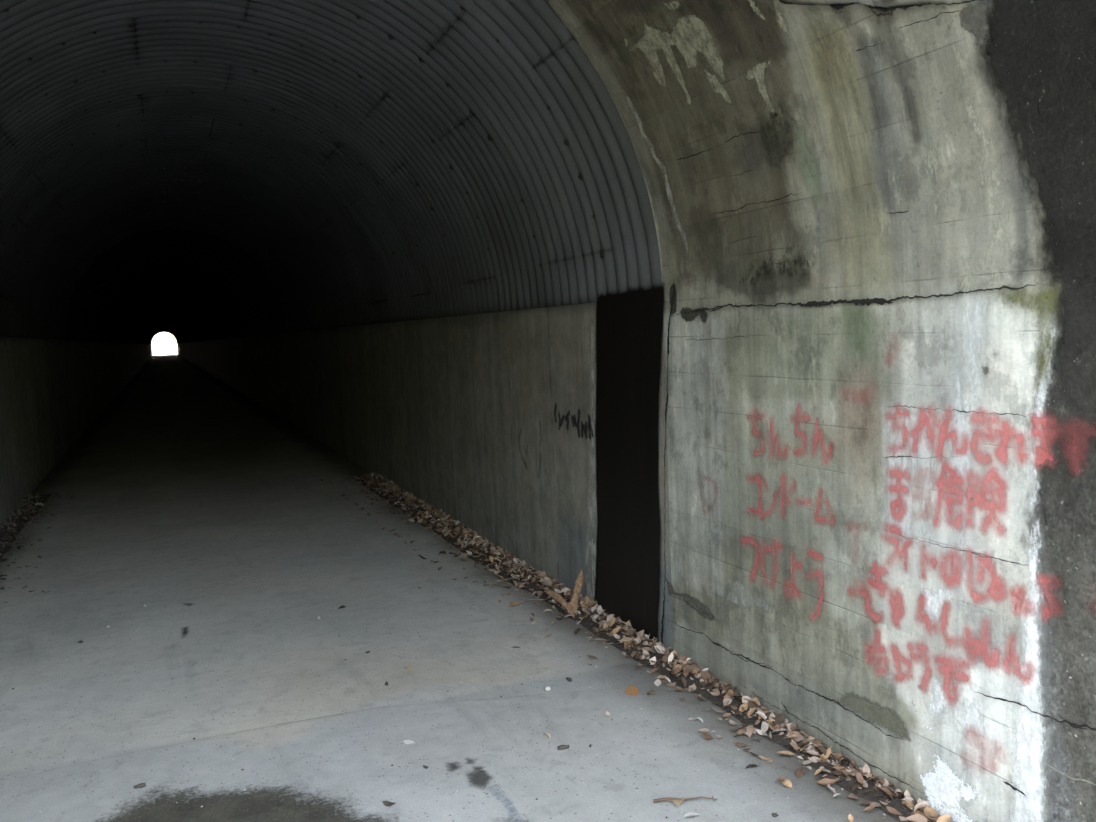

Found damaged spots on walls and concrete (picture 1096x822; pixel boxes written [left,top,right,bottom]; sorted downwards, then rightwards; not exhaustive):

peeling [749,0,789,38]
crack [779,0,984,28]
peeling [624,0,731,105]
peeling [747,61,772,110]
crack [661,280,1038,796]
crack [975,692,1096,731]
crack [1044,763,1096,785]
damp [101,787,388,822]